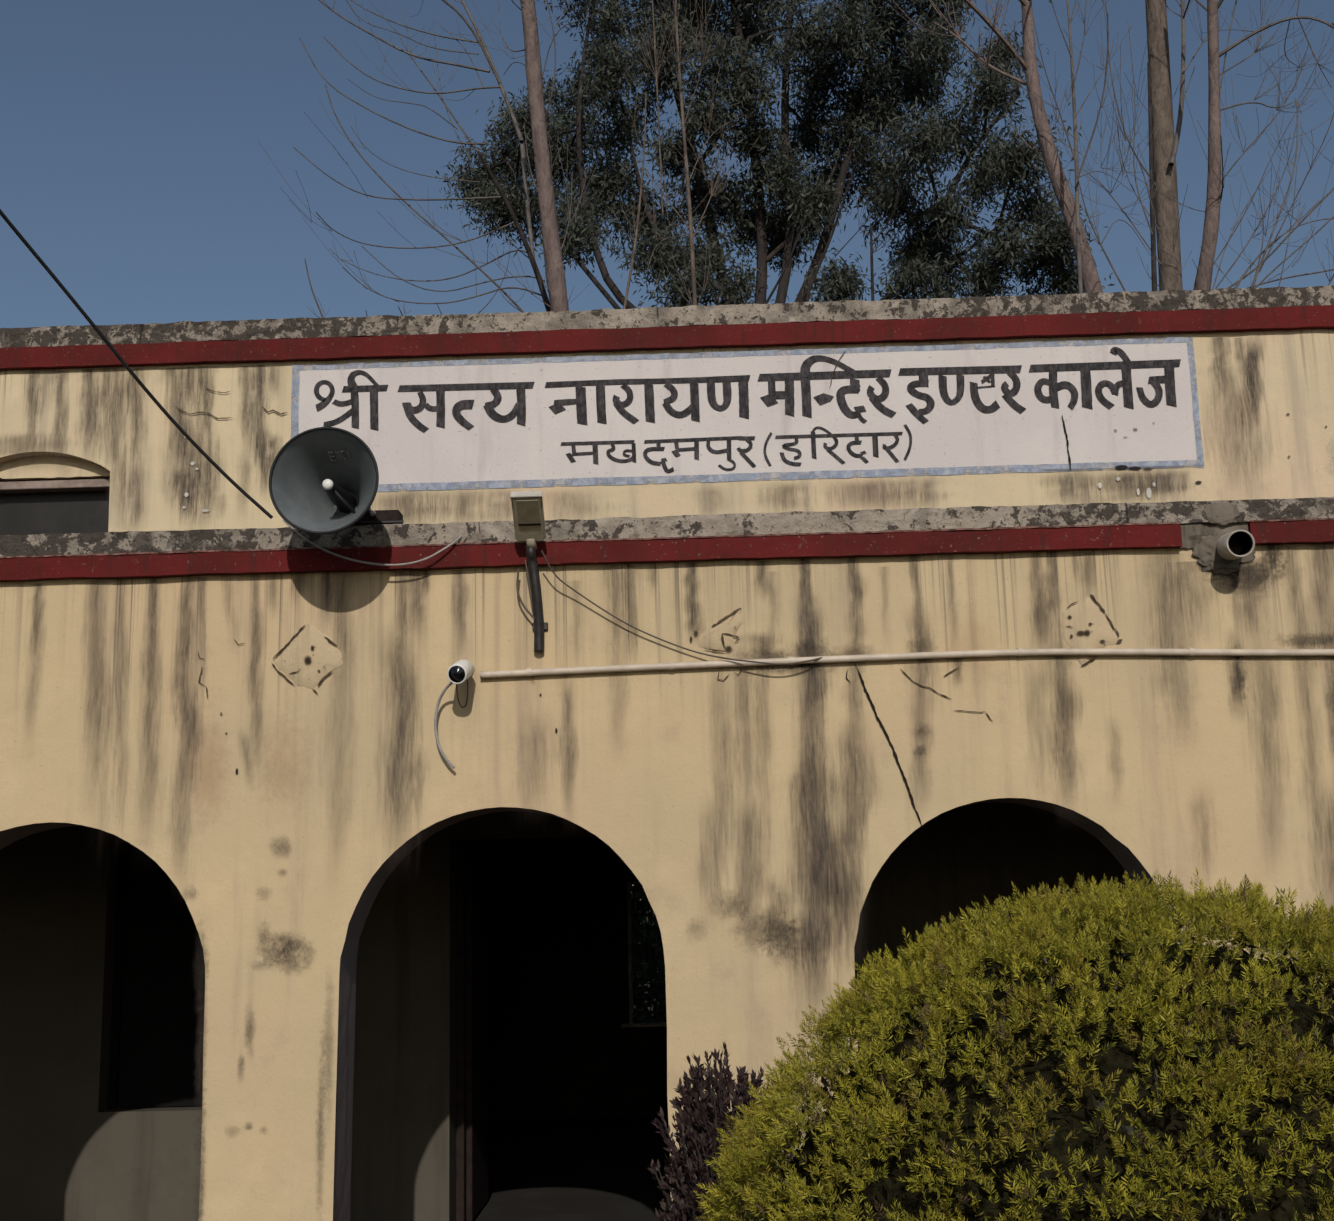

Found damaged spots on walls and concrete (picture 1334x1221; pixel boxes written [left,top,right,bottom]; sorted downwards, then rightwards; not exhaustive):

leakage [174,366,211,499]
leakage [243,365,274,479]
leakage [1246,348,1258,405]
leakage [687,562,696,629]
leakage [181,638,195,747]
flaking render [272,623,345,694]
leakage [390,671,410,799]
leakage [800,558,844,973]
crack [846,666,922,826]
leakage [1235,656,1243,689]